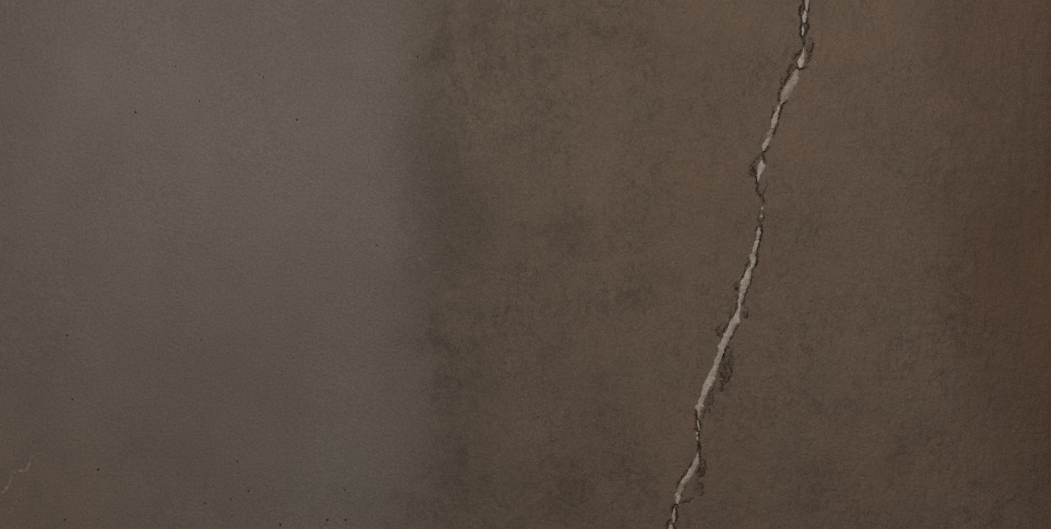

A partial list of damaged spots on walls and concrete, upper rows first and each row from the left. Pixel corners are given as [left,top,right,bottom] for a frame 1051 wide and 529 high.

crack [667,0,814,529]